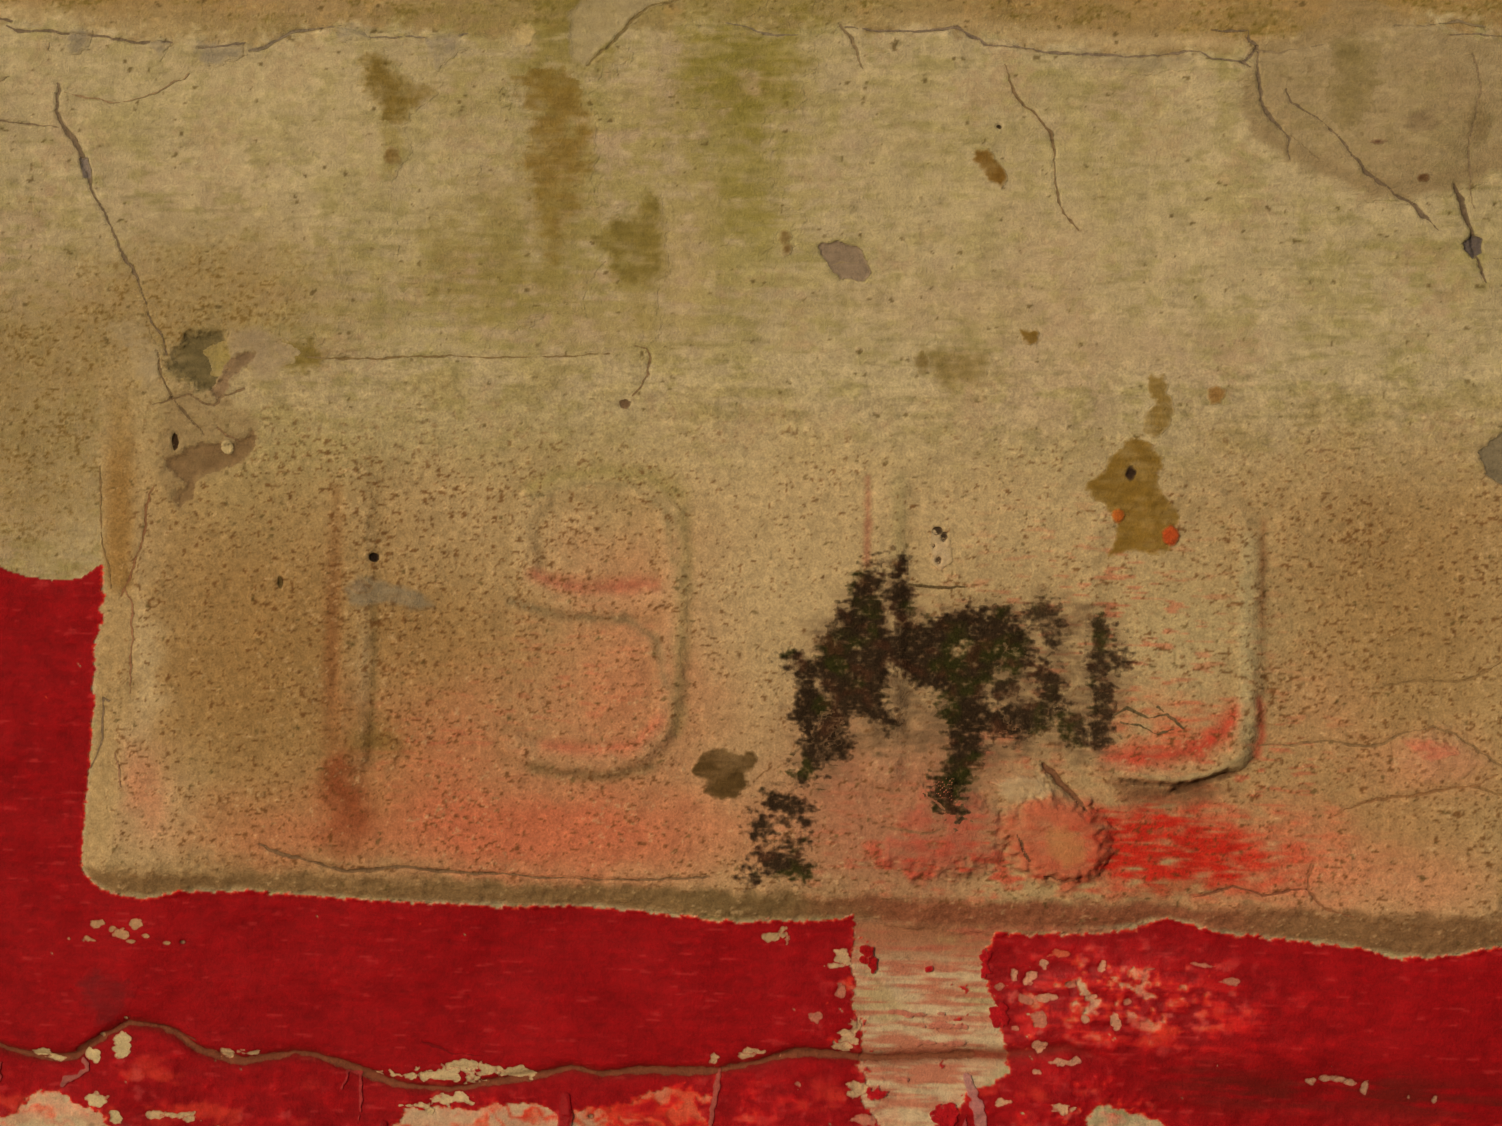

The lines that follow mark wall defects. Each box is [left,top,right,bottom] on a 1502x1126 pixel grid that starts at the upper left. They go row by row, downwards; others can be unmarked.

crack [0,18,468,356]
damp [354,47,438,182]
damp [388,58,670,349]
crack [839,19,1502,283]
damp [1235,0,1502,205]
spalling [97,314,300,517]
damp [731,545,1184,893]
peeling [85,1016,132,1064]
peeling [375,1058,537,1115]
crack [0,1020,975,1092]
peeling [824,944,878,999]
peeling [979,948,1098,1075]